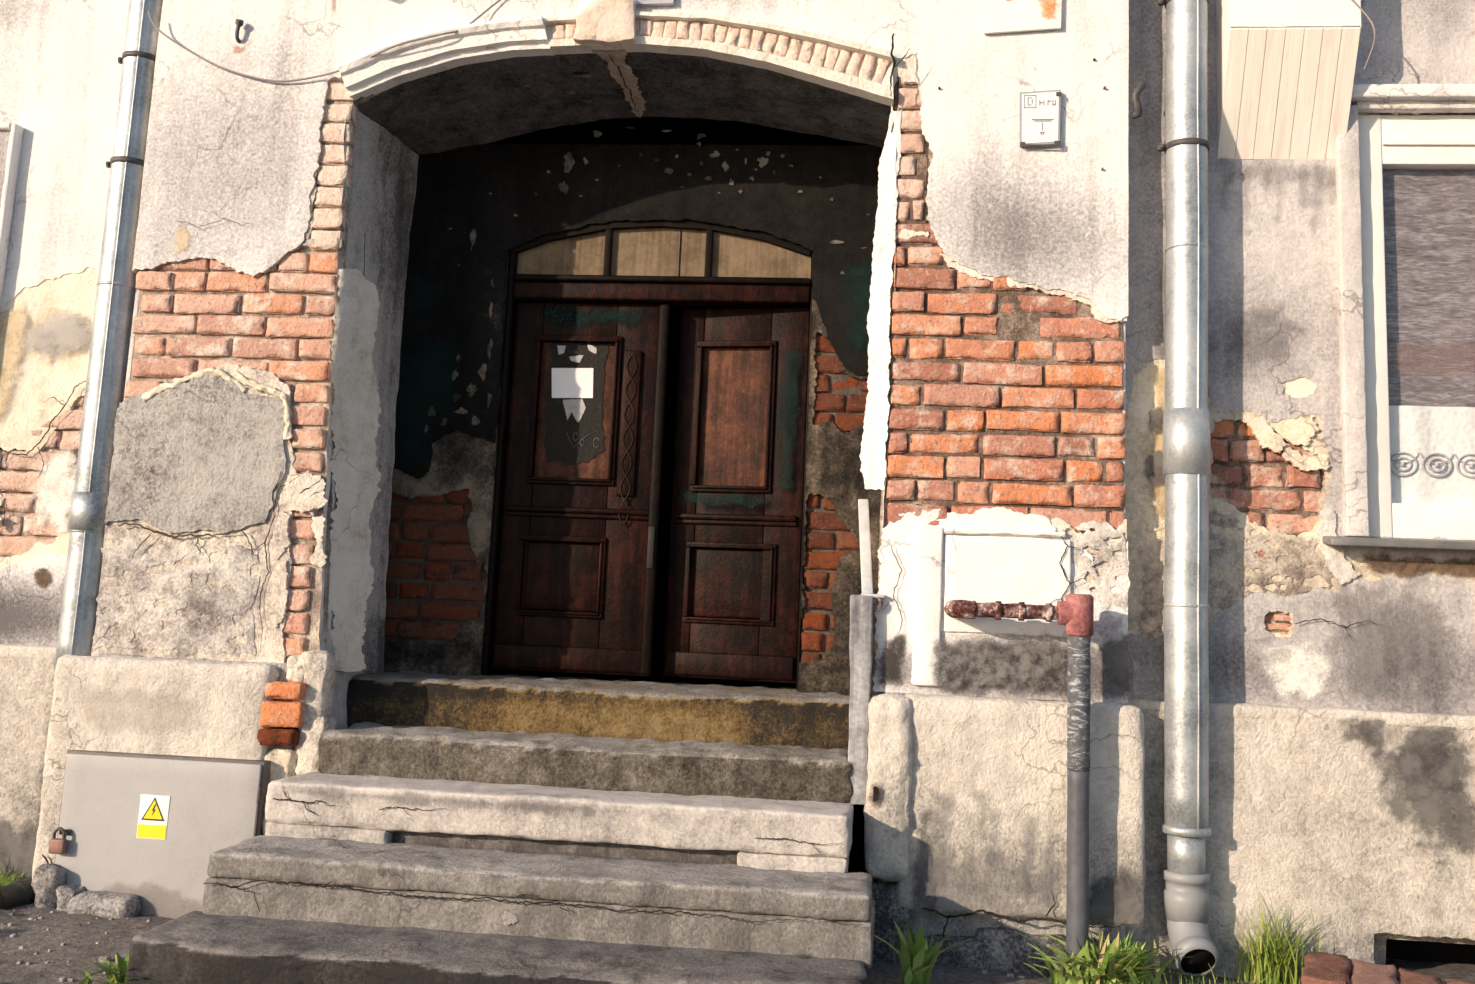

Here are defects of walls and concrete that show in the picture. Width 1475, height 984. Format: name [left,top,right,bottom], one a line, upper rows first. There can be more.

crack [609,55,640,118]
peeling [639,133,793,194]
rust [1040,0,1056,19]
peeling [0,268,99,568]
crack [118,471,323,655]
peeling [91,78,358,663]
peeling [384,339,499,675]
peeling [798,54,1165,698]
peeling [1208,393,1475,638]
damp [933,634,1068,696]
damp [1099,636,1135,697]
damp [1345,720,1475,853]